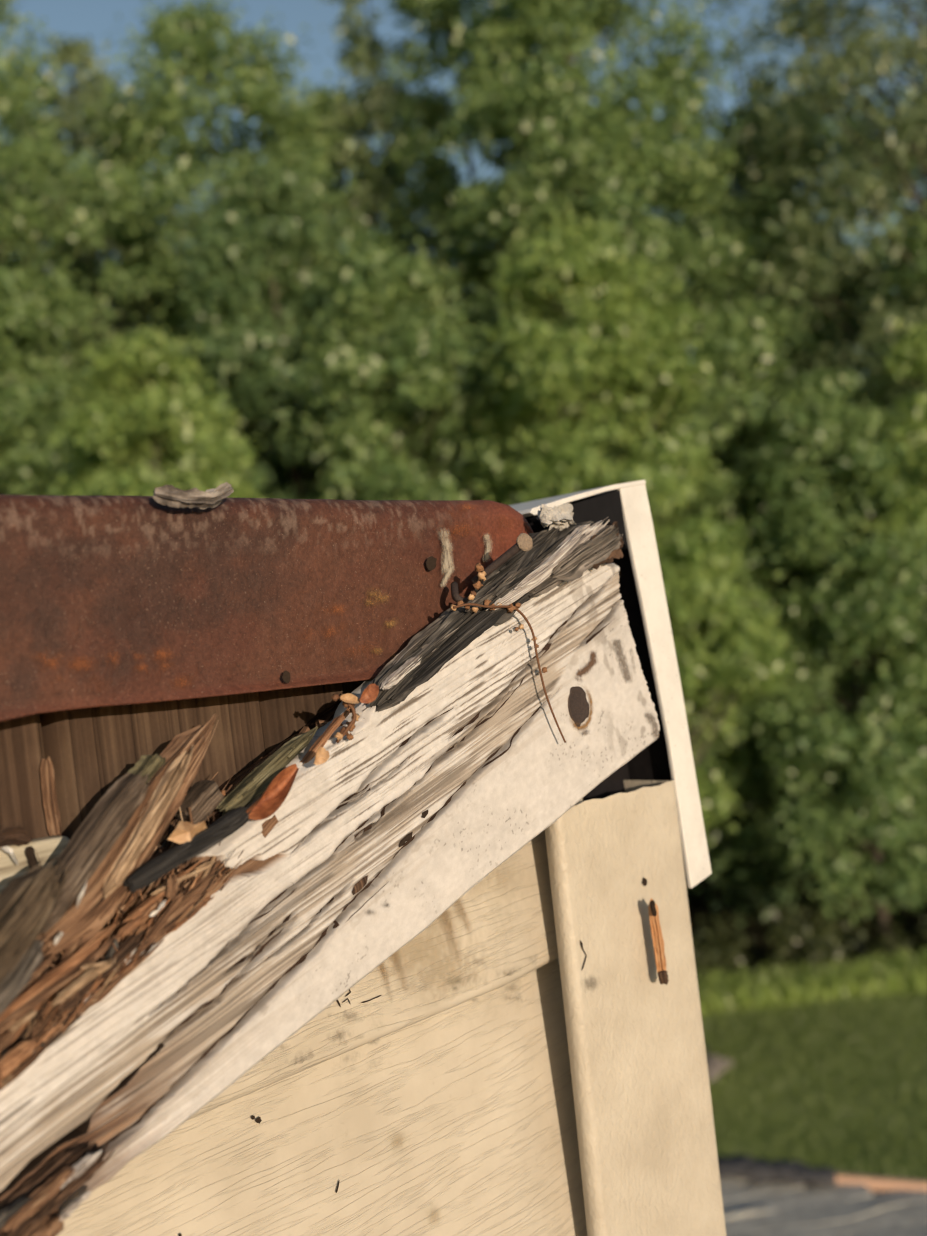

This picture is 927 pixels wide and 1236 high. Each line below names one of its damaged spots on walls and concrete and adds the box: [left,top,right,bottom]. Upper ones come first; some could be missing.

peeling [577,652,596,677]
peeling [614,640,631,681]
peeling [1,846,38,869]
peeling [352,875,368,895]